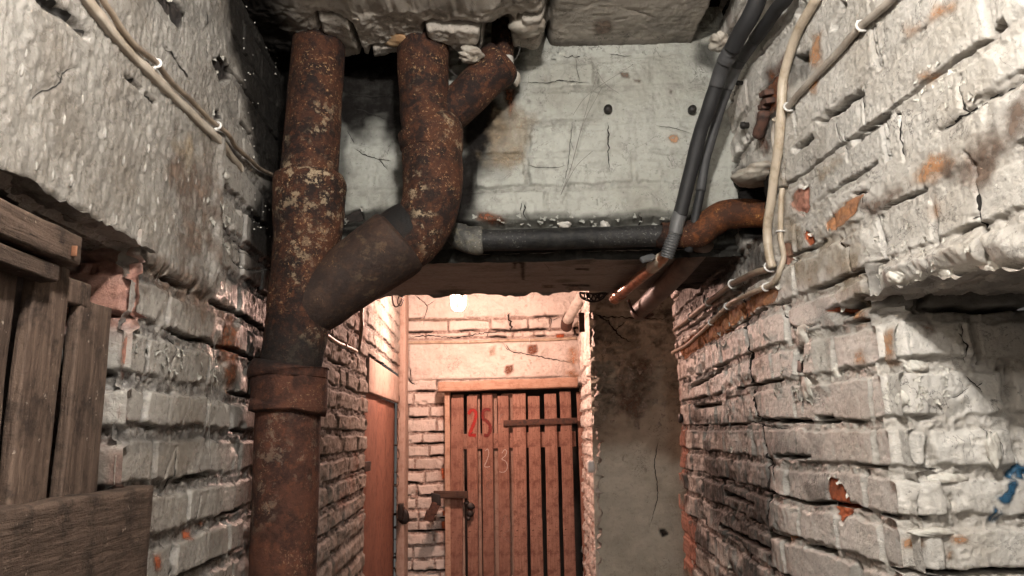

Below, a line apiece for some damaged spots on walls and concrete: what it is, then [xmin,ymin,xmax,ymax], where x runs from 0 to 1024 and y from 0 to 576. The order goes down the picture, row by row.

crack [529,55,585,83]
crack [530,129,573,185]
crack [604,126,612,172]
spalling [791,184,865,245]
crack [410,297,566,362]
flaking render [680,283,781,382]
crack [650,440,659,524]
spalling [828,473,863,521]